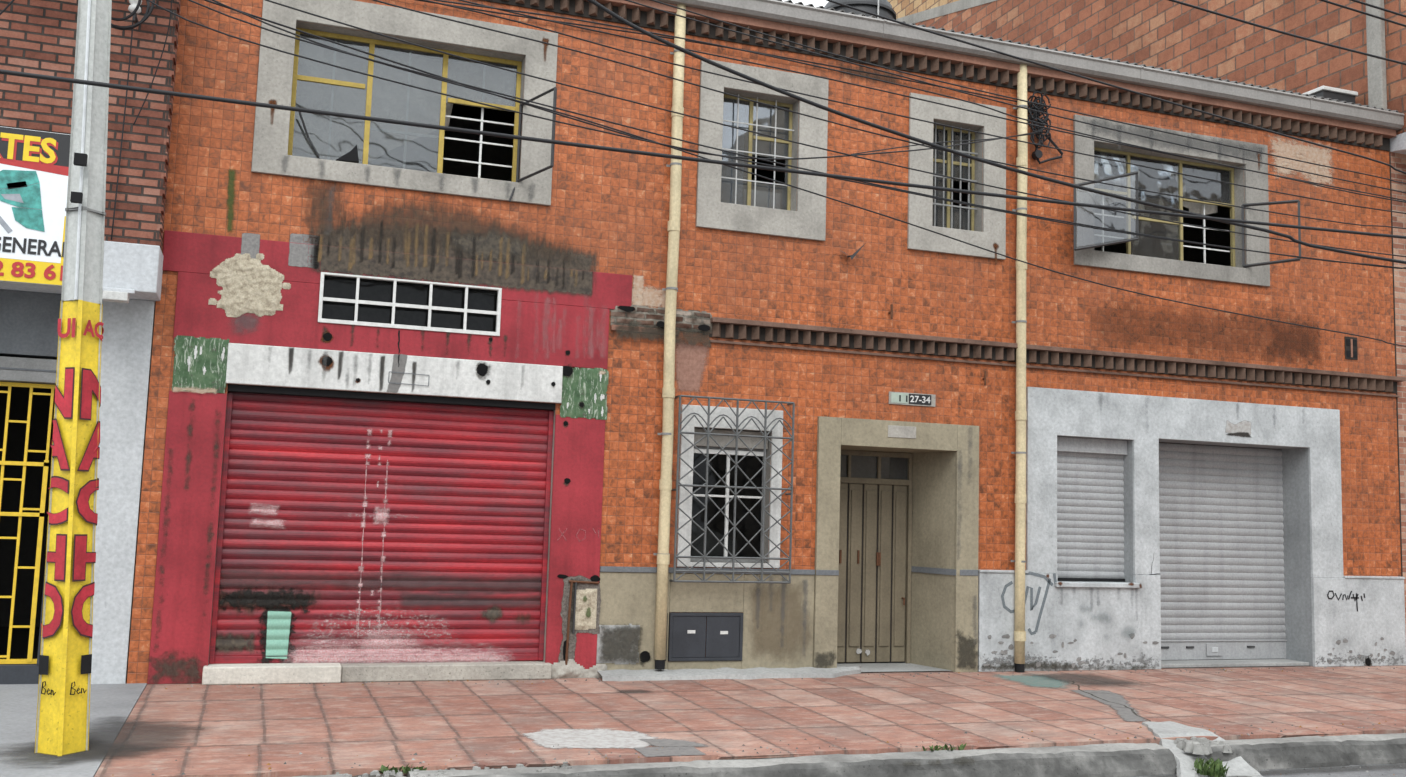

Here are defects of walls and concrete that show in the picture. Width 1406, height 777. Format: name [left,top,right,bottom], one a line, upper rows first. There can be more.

flaking render [208,253,291,317]
water stain [349,222,396,269]
water stain [456,236,584,287]
peeling [172,335,229,393]
peeling [290,429,506,663]
crack [1071,682,1151,722]